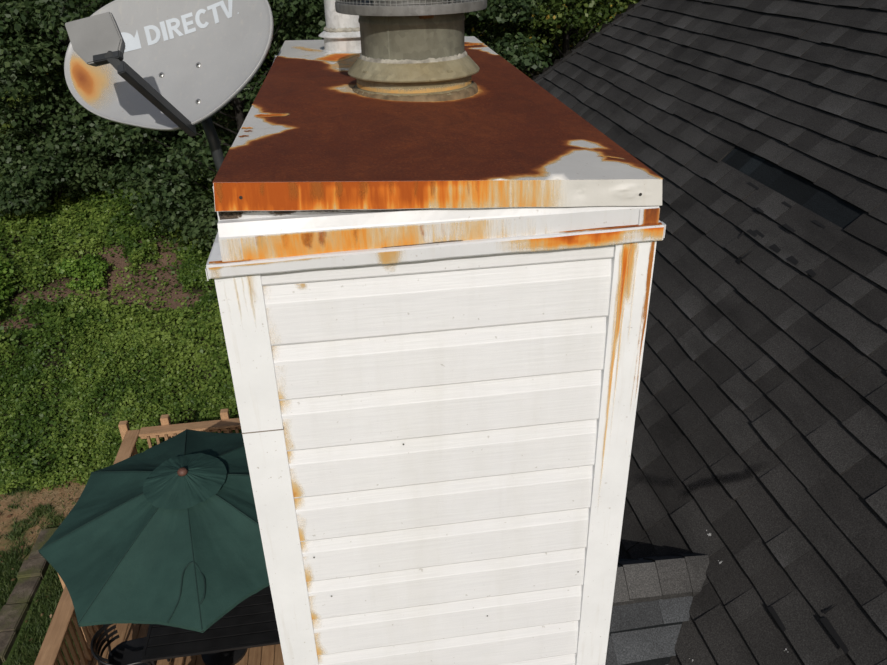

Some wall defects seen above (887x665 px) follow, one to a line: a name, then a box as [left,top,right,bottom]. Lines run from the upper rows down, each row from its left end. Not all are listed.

rust [213,42,663,211]
rust [209,221,487,270]
rust [511,208,664,467]